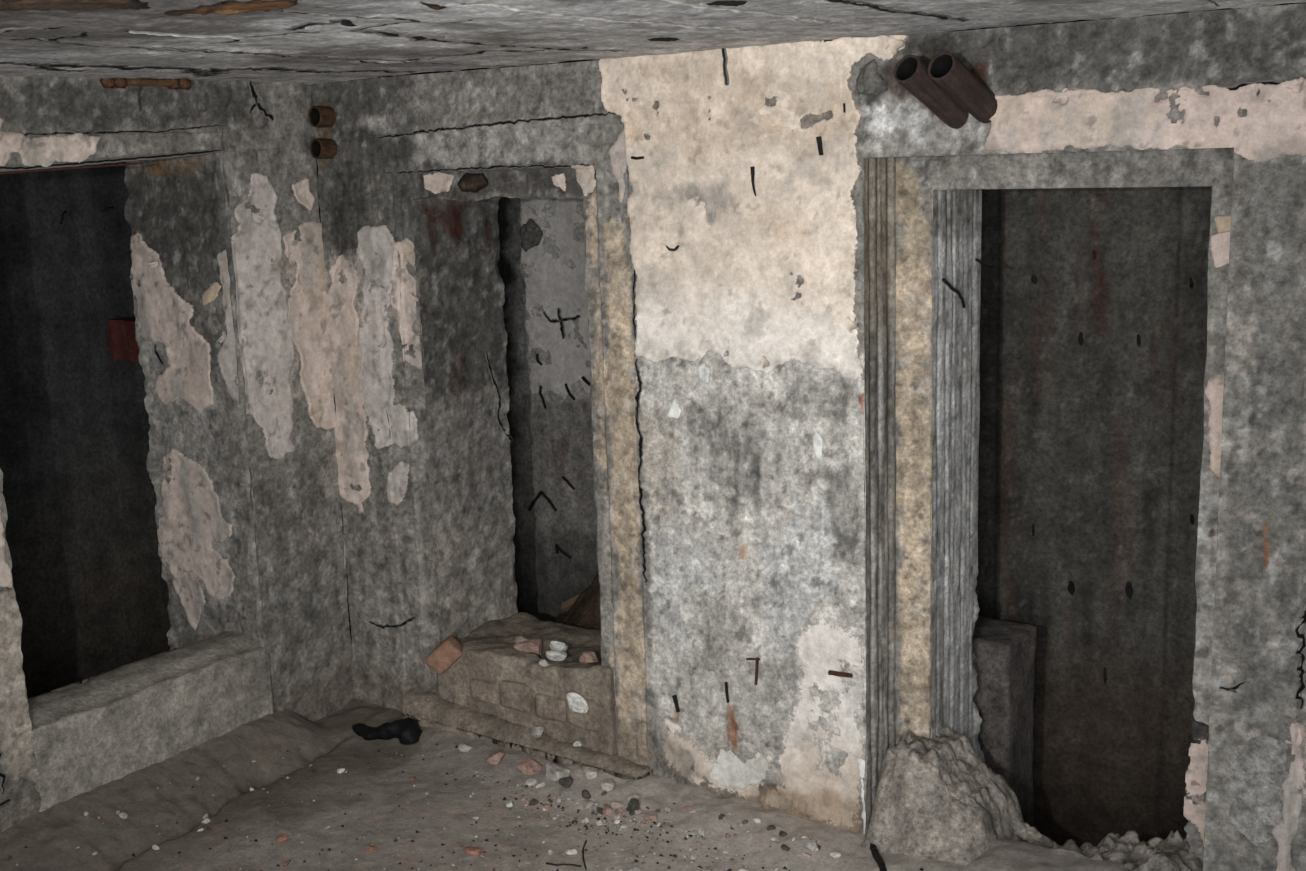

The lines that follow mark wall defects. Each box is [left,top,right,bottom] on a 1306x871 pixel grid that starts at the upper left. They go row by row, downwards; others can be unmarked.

peeling [0,118,101,167]
crack [0,0,970,171]
crack [386,163,594,175]
peeling [984,77,1306,163]
crack [662,243,680,252]
peeling [130,173,422,513]
crack [632,270,649,583]
peeling [0,509,13,588]
peeling [157,448,236,631]
crack [1294,583,1306,709]
crack [0,751,8,794]